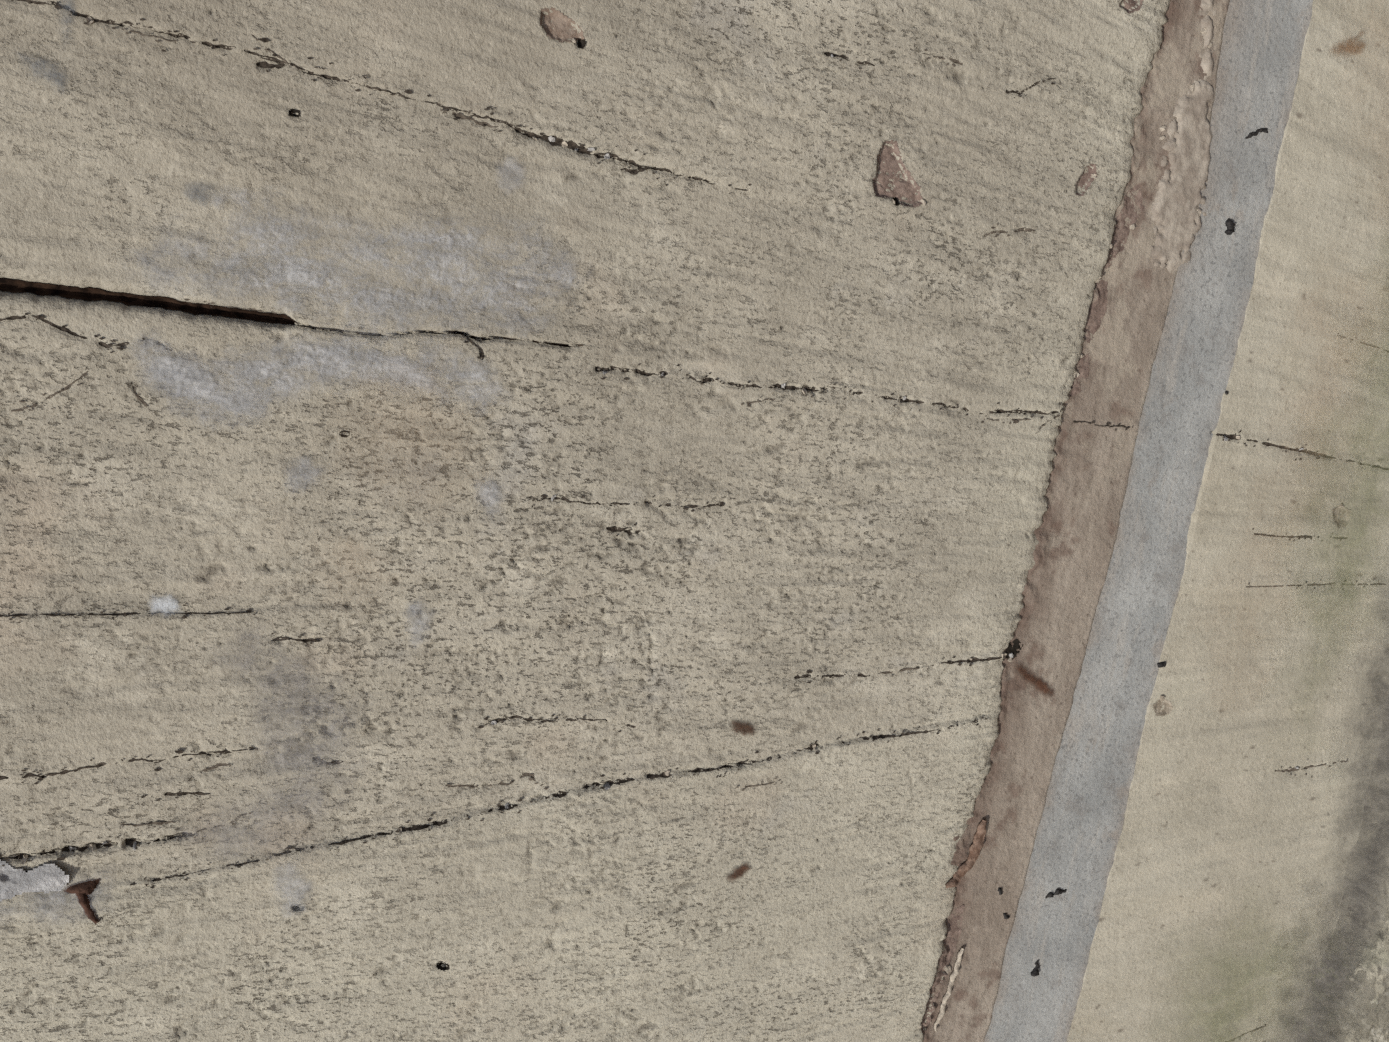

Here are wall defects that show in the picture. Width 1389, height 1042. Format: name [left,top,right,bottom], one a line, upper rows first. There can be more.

crack [17,0,751,194]
crack [0,313,171,412]
crack [464,338,485,360]
crack [595,364,1133,434]
crack [0,604,320,645]
crack [794,653,1014,683]
crack [0,715,987,890]
corrosion [63,878,101,925]